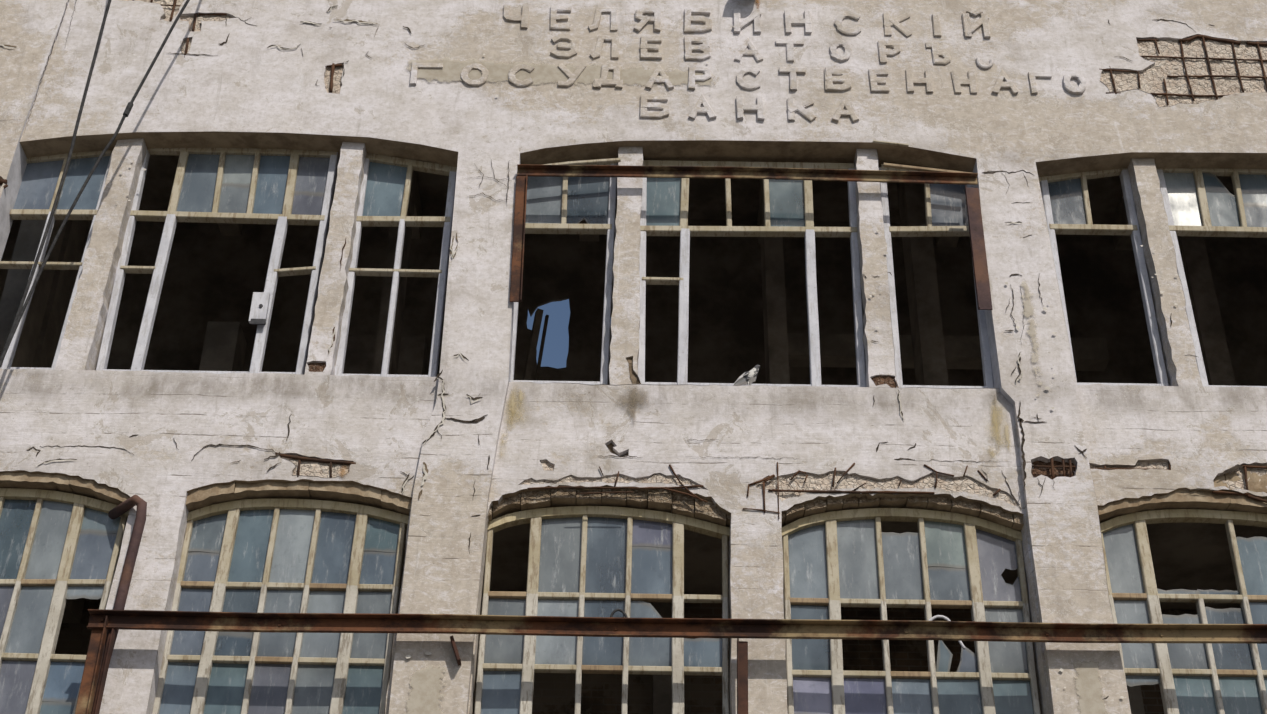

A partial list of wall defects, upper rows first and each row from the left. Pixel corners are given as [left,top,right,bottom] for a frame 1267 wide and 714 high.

spalling [122,0,234,57]
spalling [324,63,344,94]
spalling [1099,35,1267,107]
crack [982,170,1035,238]
crack [873,273,1055,510]
crack [400,353,490,554]
spalling [1031,457,1171,479]
spalling [1212,464,1267,503]